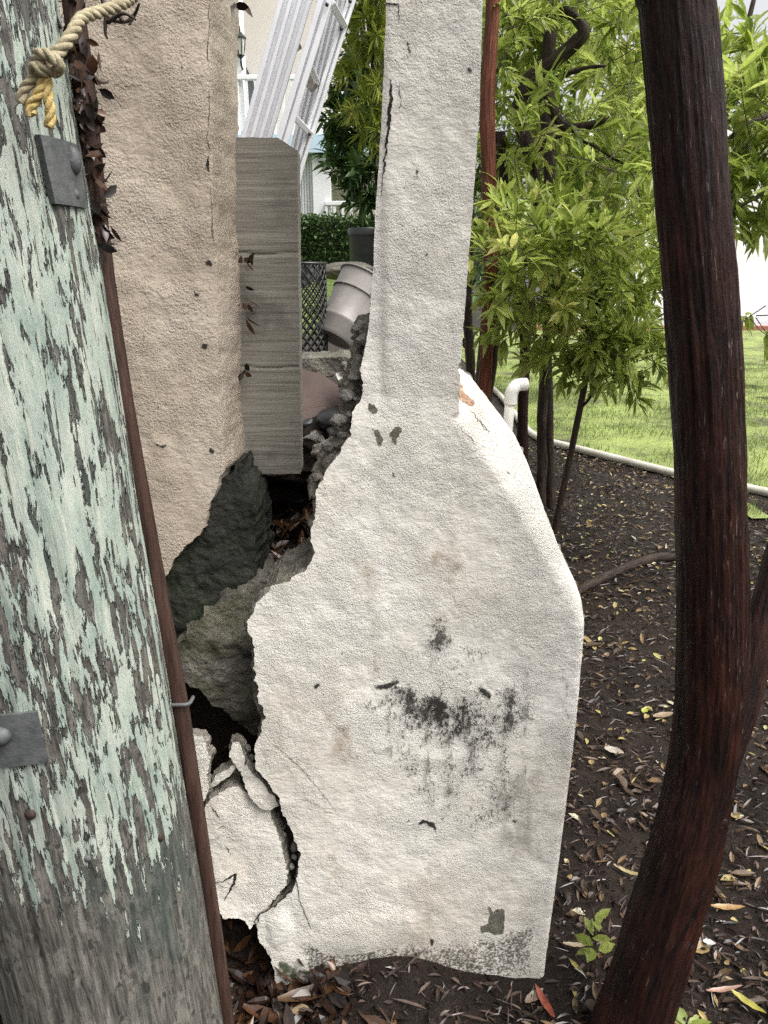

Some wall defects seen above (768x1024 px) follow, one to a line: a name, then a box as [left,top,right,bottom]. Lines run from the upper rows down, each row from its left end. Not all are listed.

crack [381,79,402,195]
spalling [248,313,378,618]
peeling [372,427,402,446]
flaking render [193,728,216,801]
flaking render [229,636,281,810]
crack [240,744,340,817]
damp [363,615,532,837]
crack [212,808,237,902]
crack [254,806,312,929]